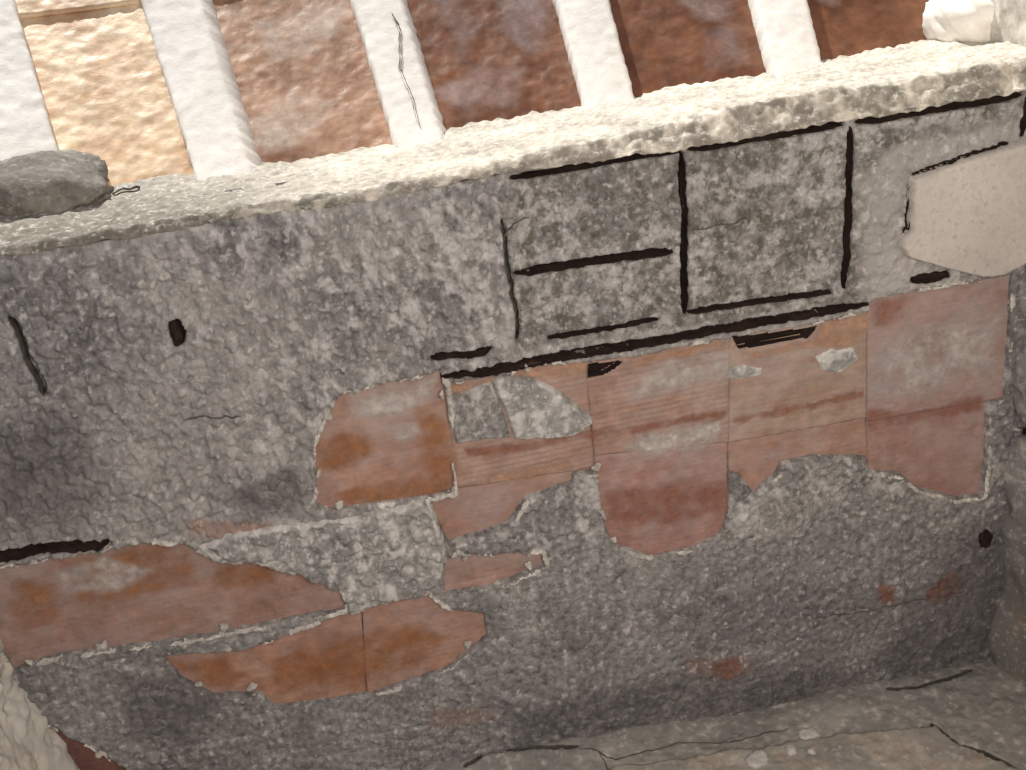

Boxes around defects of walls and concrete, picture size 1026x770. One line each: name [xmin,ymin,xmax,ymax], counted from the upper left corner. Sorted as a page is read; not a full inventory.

crack [691,218,745,230]
crack [501,217,530,339]
crack [9,316,46,395]
spalling [439,378,464,431]
spalling [425,462,458,524]
spalling [868,445,993,505]
spalling [499,548,550,589]
spalling [80,641,152,658]
spalling [168,623,276,646]
spalling [289,590,390,636]
crack [463,728,788,770]
crack [930,723,1016,768]